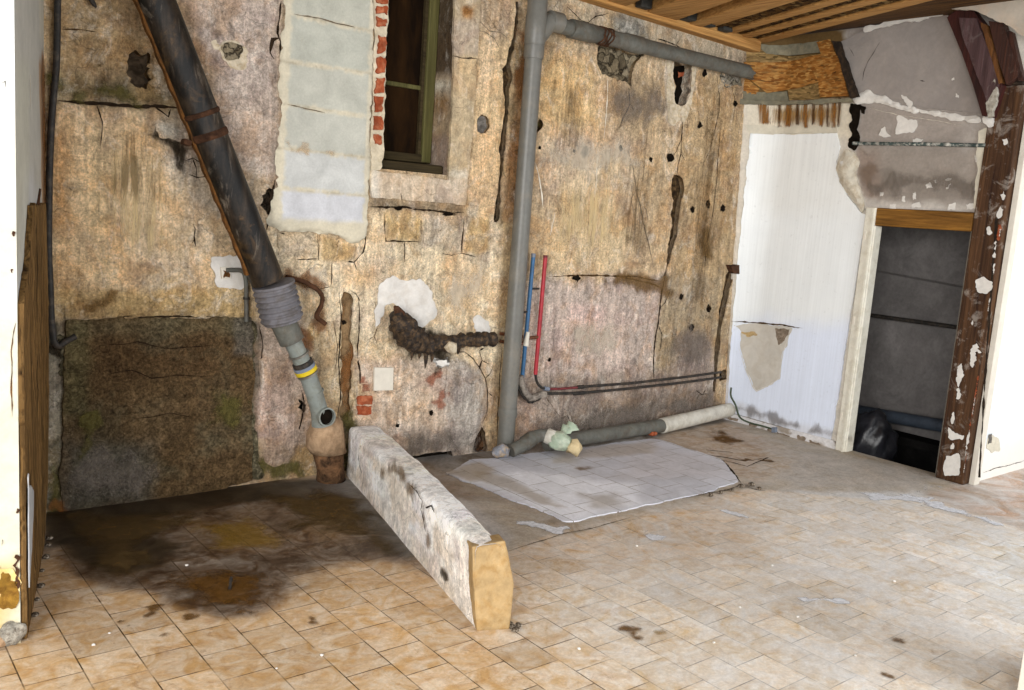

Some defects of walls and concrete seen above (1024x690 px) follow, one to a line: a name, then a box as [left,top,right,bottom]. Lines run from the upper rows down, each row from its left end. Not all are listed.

flaking render [597,45,641,83]
crack [58,78,177,148]
spalling [848,103,866,150]
peeling [879,115,923,142]
peeling [947,79,999,210]
crack [552,155,669,375]
peeling [975,192,1006,309]
peeling [731,321,799,392]
peeling [956,343,981,399]
water stain [270,492,391,551]
water stain [144,604,163,617]
water stain [177,571,260,620]